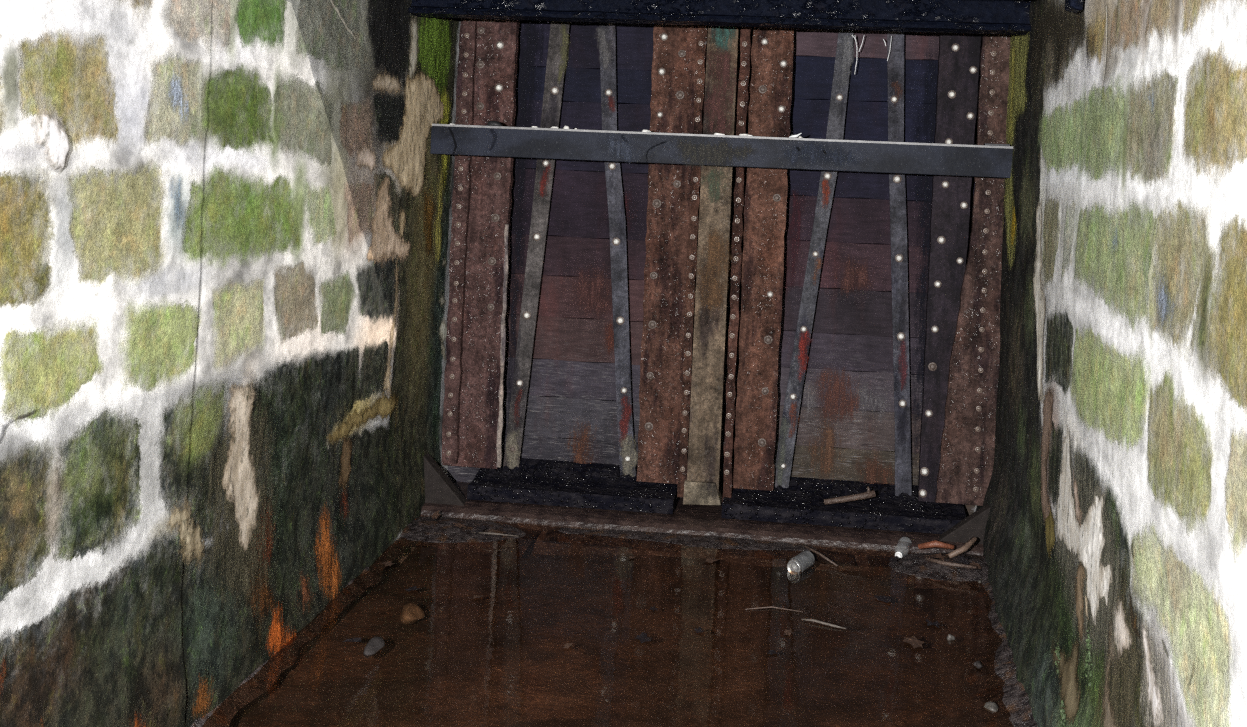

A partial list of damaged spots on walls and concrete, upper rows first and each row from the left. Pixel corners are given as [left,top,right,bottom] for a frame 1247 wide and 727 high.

rust [316,511,340,598]
rust [249,573,290,654]